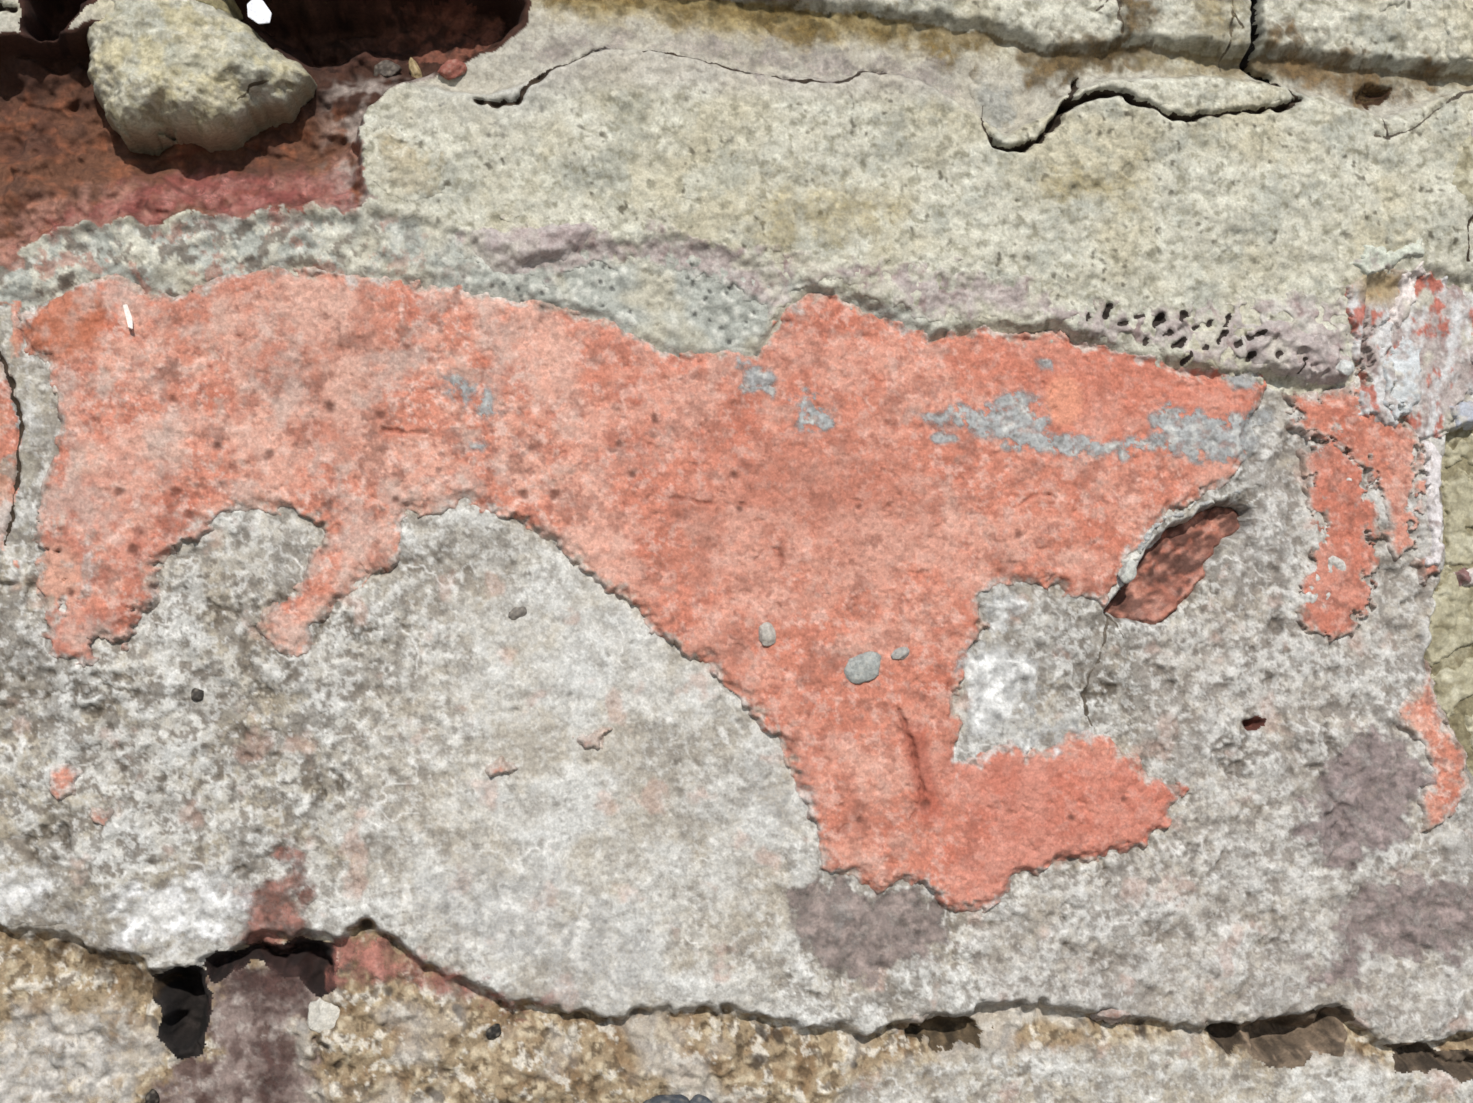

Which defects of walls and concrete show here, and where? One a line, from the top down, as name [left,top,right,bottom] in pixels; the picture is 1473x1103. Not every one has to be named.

peeling [247,0,272,24]
crack [1096,0,1124,34]
crack [1218,0,1245,72]
crack [473,46,887,109]
crack [981,77,1302,153]
crack [1465,215,1473,262]
crack [0,351,25,546]
spalling [0,209,1473,1044]